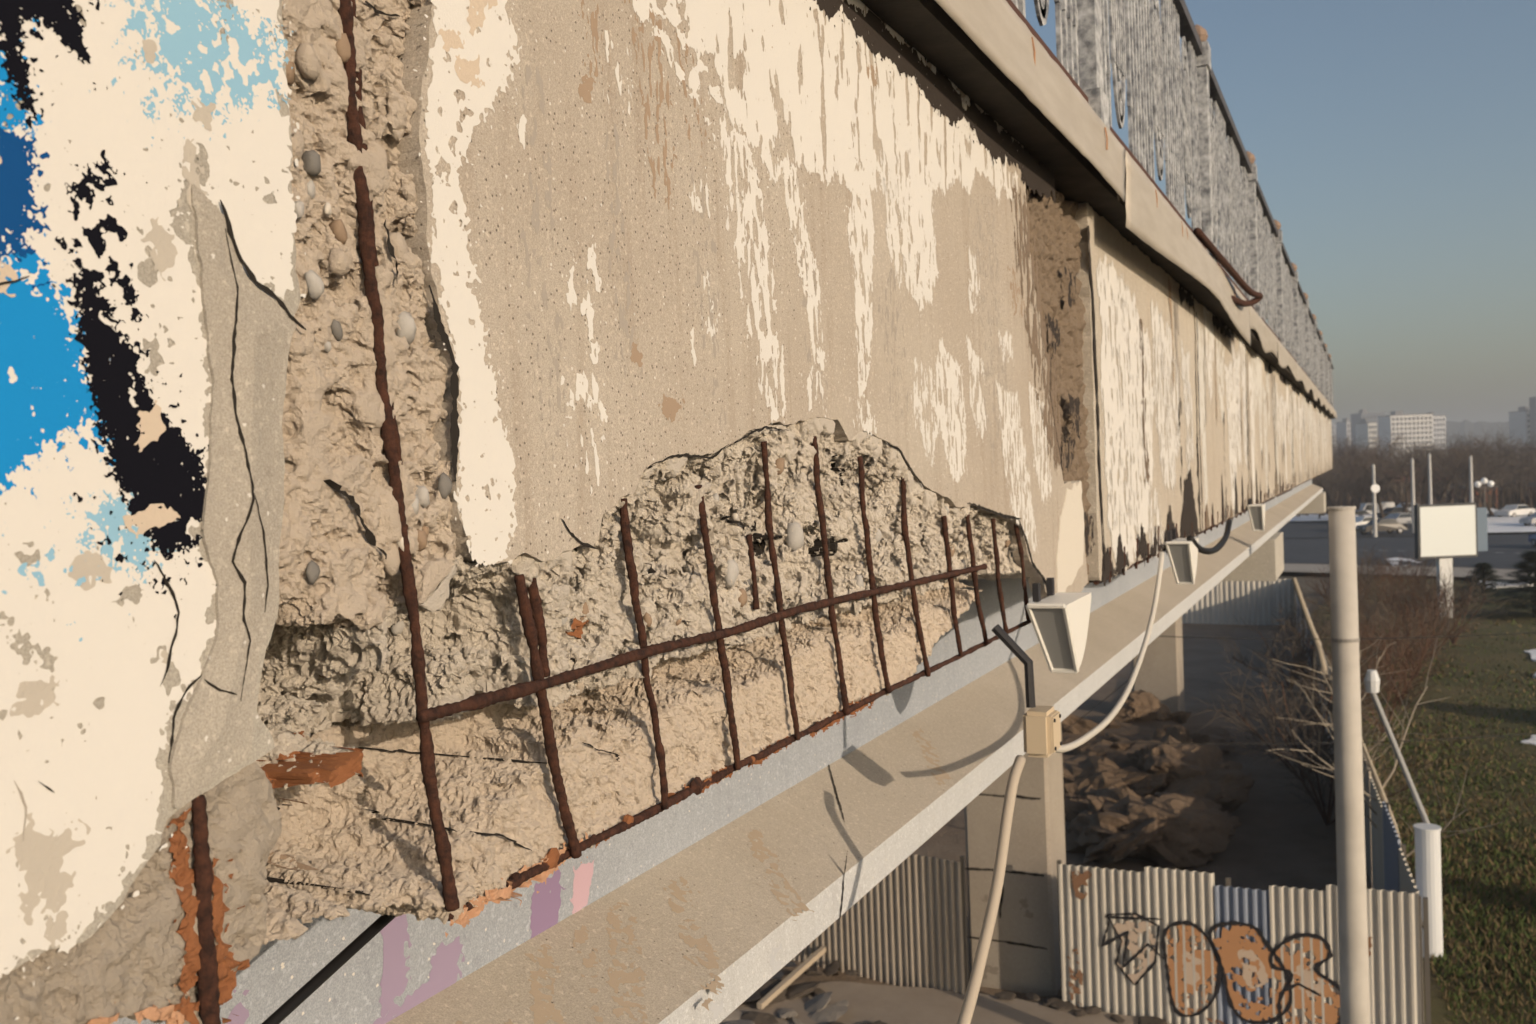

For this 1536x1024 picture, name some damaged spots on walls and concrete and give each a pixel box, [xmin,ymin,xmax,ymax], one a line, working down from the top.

peeling [1096,250,1333,587]
crack [154,200,306,763]
spalling [0,0,1094,1024]
rust [565,617,588,639]
rust [256,731,364,805]
rust [668,736,792,804]
rust [810,692,875,738]
rust [86,796,250,1024]
rust [267,851,319,871]
rust [445,814,634,938]